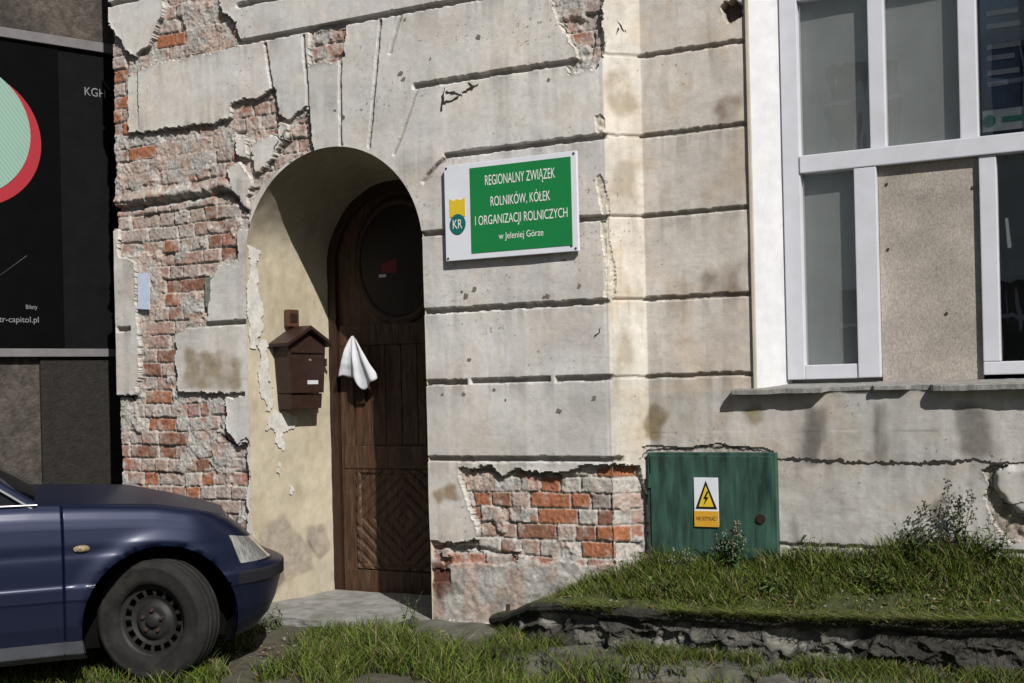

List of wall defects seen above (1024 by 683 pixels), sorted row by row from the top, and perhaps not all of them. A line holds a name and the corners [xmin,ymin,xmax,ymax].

spalling [549,0,606,75]
crack [440,82,478,111]
spalling [109,0,314,530]
leakage [645,406,667,439]
crack [639,443,1024,466]
spalling [431,442,774,624]
spalling [981,464,1024,545]